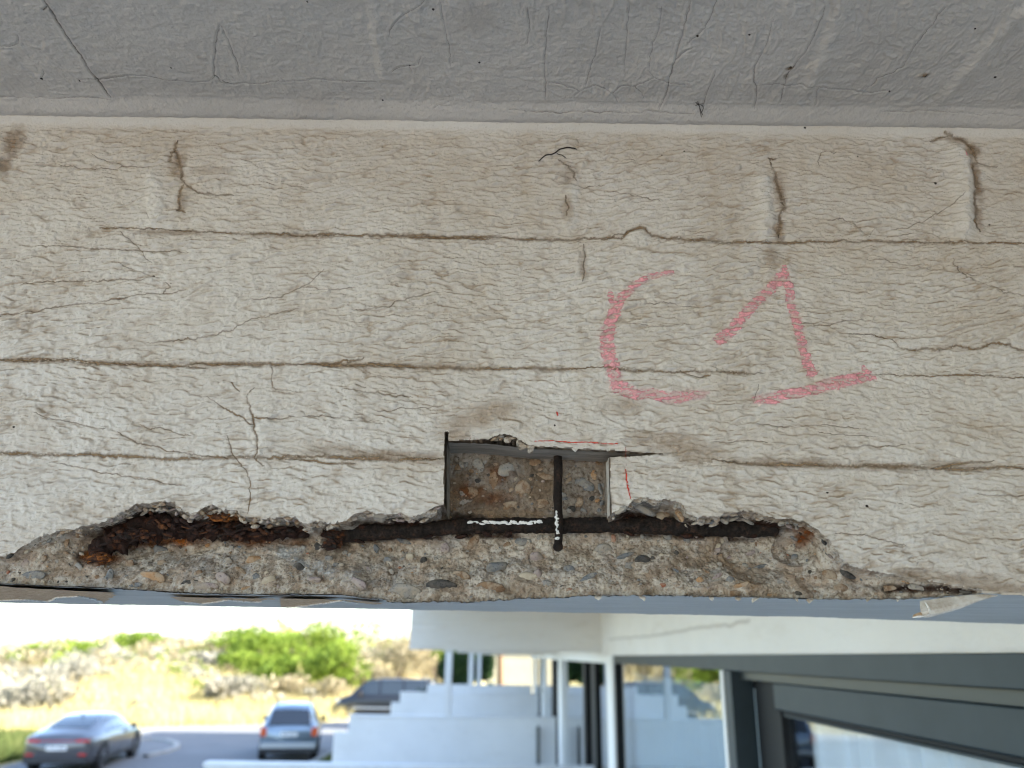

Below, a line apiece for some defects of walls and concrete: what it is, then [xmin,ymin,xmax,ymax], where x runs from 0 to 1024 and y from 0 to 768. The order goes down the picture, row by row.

spalling [0,431,998,618]